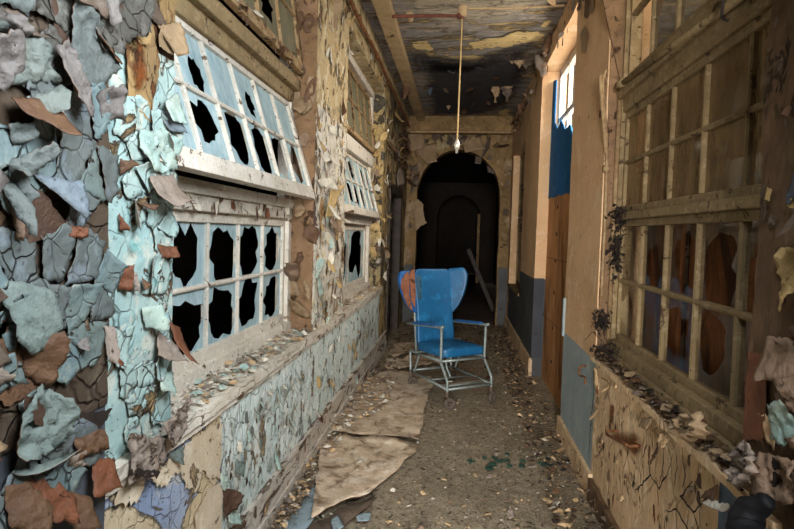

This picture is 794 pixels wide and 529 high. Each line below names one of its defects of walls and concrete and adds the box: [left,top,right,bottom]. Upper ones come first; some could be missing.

peeling [0,0,386,529]